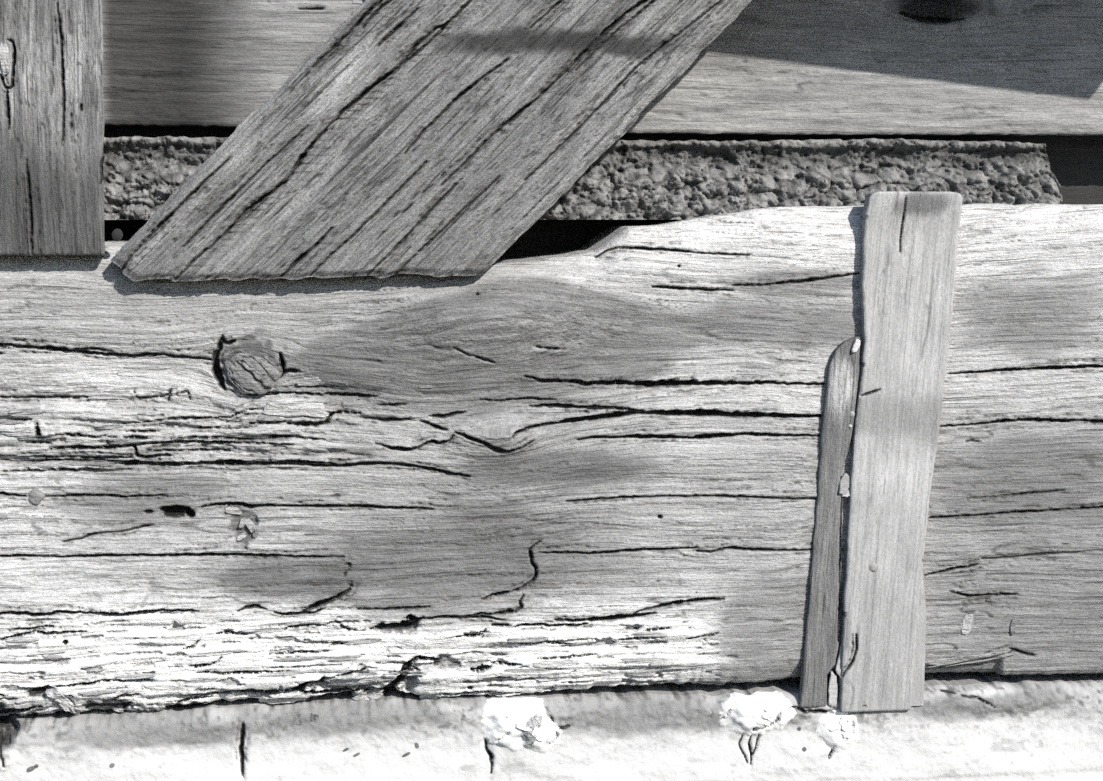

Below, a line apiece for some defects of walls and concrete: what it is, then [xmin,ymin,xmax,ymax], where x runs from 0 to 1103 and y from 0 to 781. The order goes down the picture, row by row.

crack [175,0,471,279]
crack [281,0,655,277]
crack [949,364,1103,374]
crack [0,336,825,497]
crack [941,418,1103,442]
crack [201,502,432,510]
crack [929,489,1103,518]
crack [0,524,812,708]
crack [567,495,858,676]
crack [0,679,151,767]
crack [238,722,246,775]
crack [721,706,853,764]